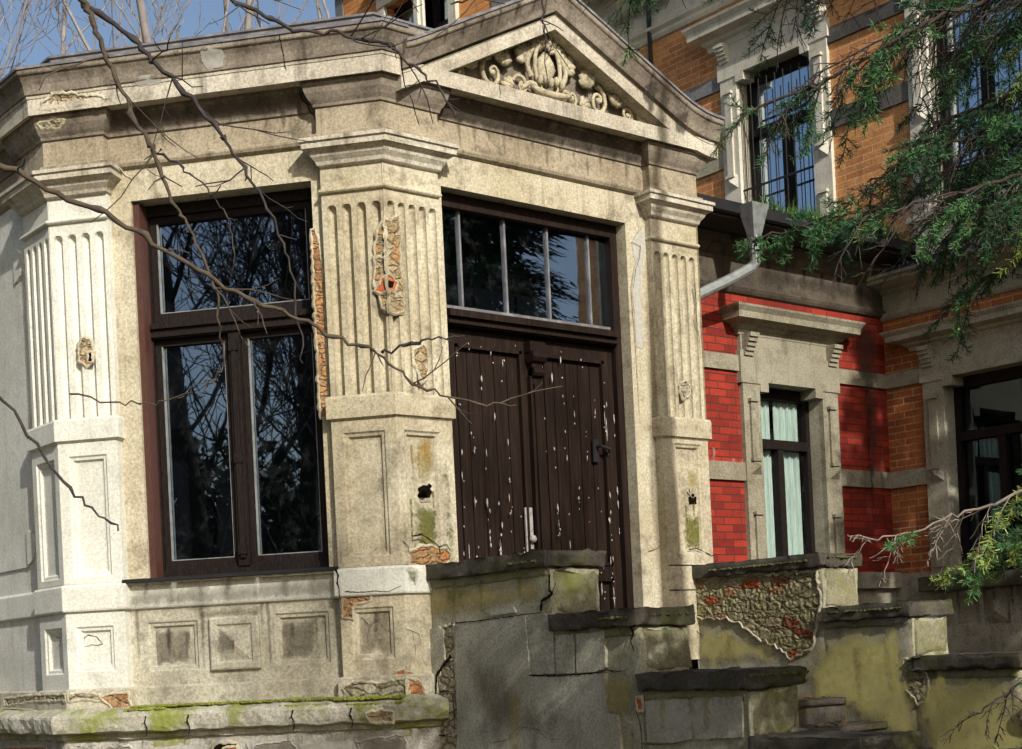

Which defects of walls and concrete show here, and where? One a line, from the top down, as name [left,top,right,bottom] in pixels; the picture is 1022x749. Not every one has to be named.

spalling [371,214,407,316]
spalling [76,336,96,368]
spalling [309,227,330,420]
spalling [411,342,430,385]
spalling [407,543,453,565]
spalling [339,595,373,621]
flaking render [695,569,823,661]
flaking render [252,622,457,749]
water stain [814,631,1022,749]
spalling [211,740,240,749]